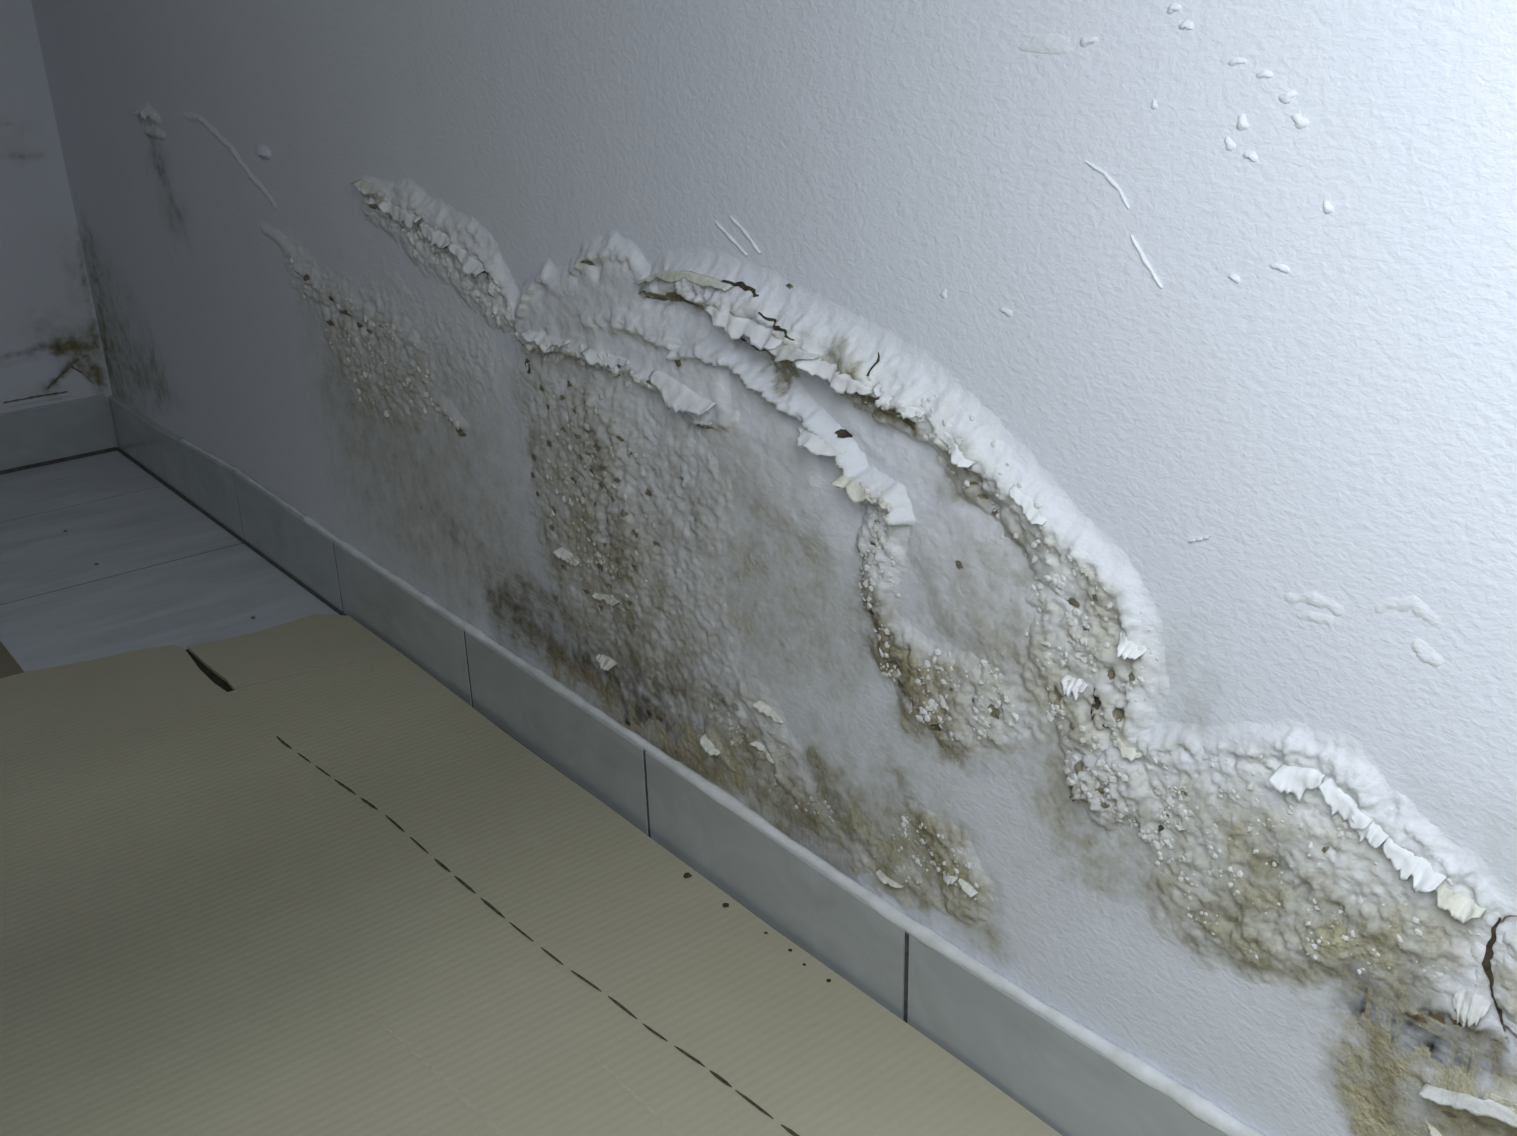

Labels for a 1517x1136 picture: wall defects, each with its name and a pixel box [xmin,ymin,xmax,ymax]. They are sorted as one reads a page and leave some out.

damp [53,325,146,384]
damp [762,349,799,394]
damp [861,396,915,427]
peeling [259,173,1517,1136]
damp [812,756,979,907]
damp [1200,824,1283,969]
damp [1294,916,1517,1136]
crack [1481,915,1517,1038]